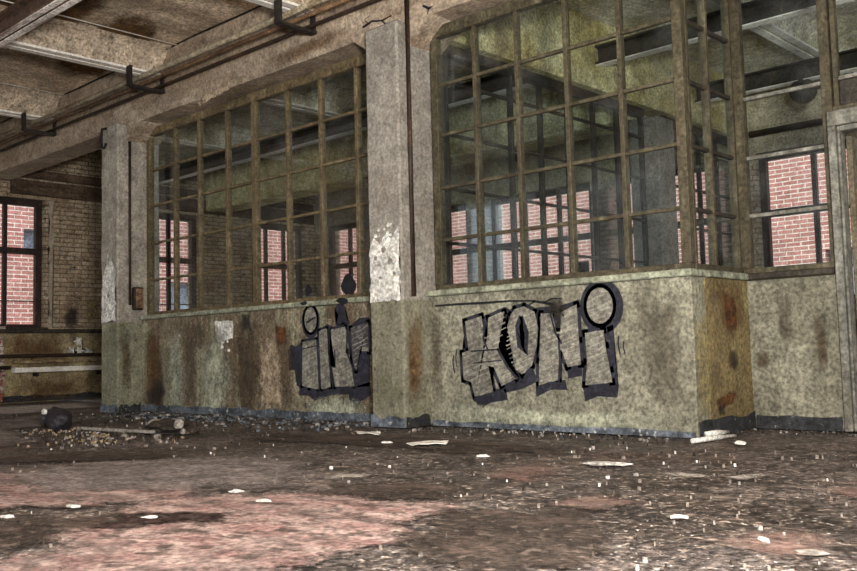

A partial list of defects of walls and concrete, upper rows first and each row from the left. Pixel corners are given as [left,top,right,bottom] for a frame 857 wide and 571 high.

peeling [369,223,401,303]
rust [722,293,739,328]
leakage [169,342,182,405]
leakage [203,315,283,410]